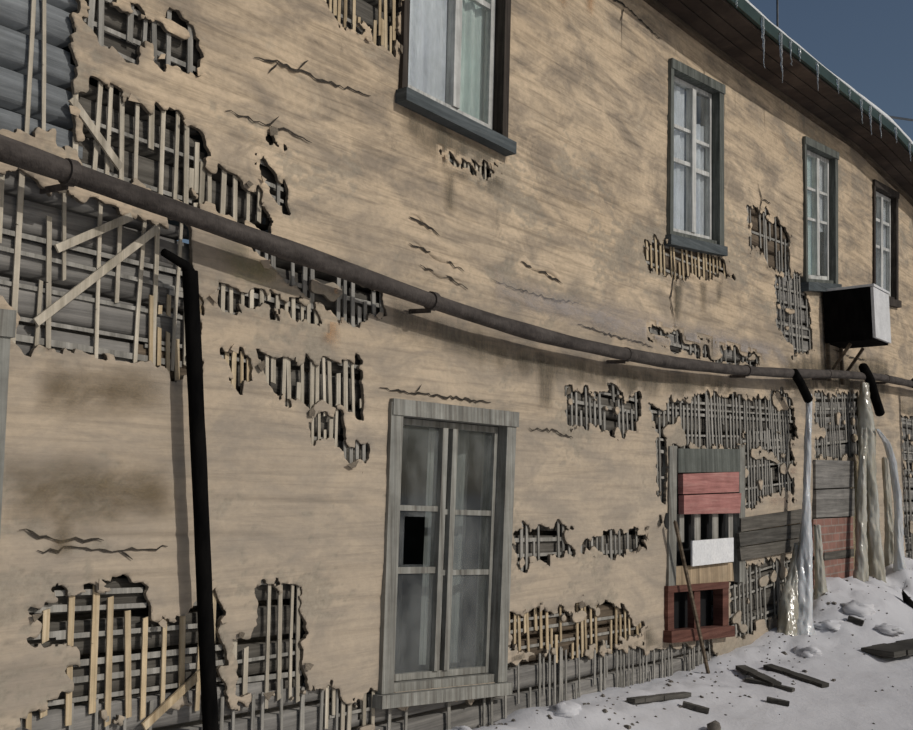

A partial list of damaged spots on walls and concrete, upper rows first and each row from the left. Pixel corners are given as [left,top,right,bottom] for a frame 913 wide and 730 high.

peeling [0,0,289,231]
crack [254,57,371,96]
crack [614,0,661,39]
peeling [0,170,190,382]
peeling [199,248,384,327]
peeling [746,205,811,357]
peeling [220,344,366,468]
crack [379,384,491,403]
peeling [565,383,798,508]
crack [21,529,168,560]
peeling [16,574,203,730]
peeling [212,579,718,730]